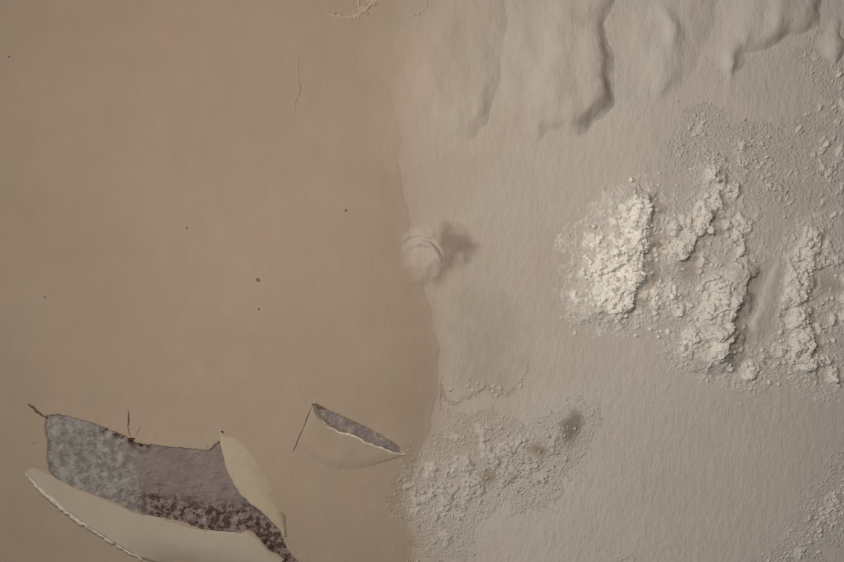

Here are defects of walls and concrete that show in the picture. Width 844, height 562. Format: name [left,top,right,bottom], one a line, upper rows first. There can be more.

peeling [25,399,311,562]
flaking render [293,395,603,562]